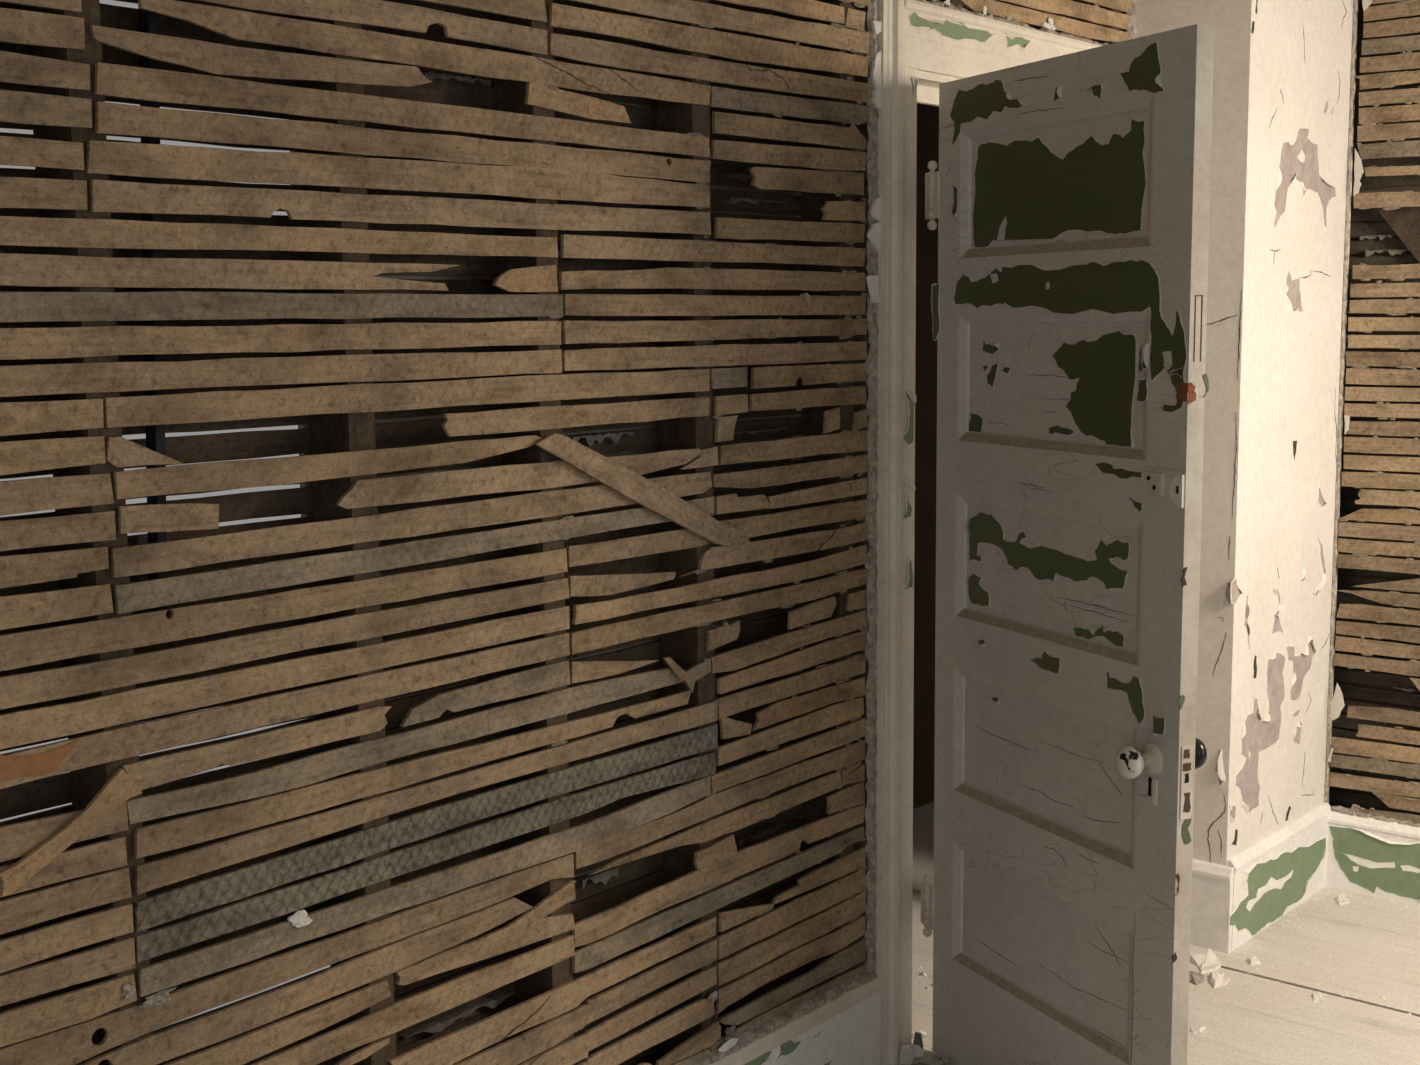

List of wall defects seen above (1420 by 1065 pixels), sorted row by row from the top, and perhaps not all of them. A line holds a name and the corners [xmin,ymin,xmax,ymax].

peeling [908,11,1031,51]
peeling [949,78,1023,145]
peeling [1119,41,1164,94]
peeling [951,117,1147,248]
peeling [1273,127,1336,234]
peeling [1353,150,1364,196]
peeling [931,259,1188,513]
peeling [966,512,1131,608]
peeling [1106,671,1185,737]
peeling [1215,578,1316,845]
peeling [1331,683,1345,721]
peeling [1229,825,1420,936]